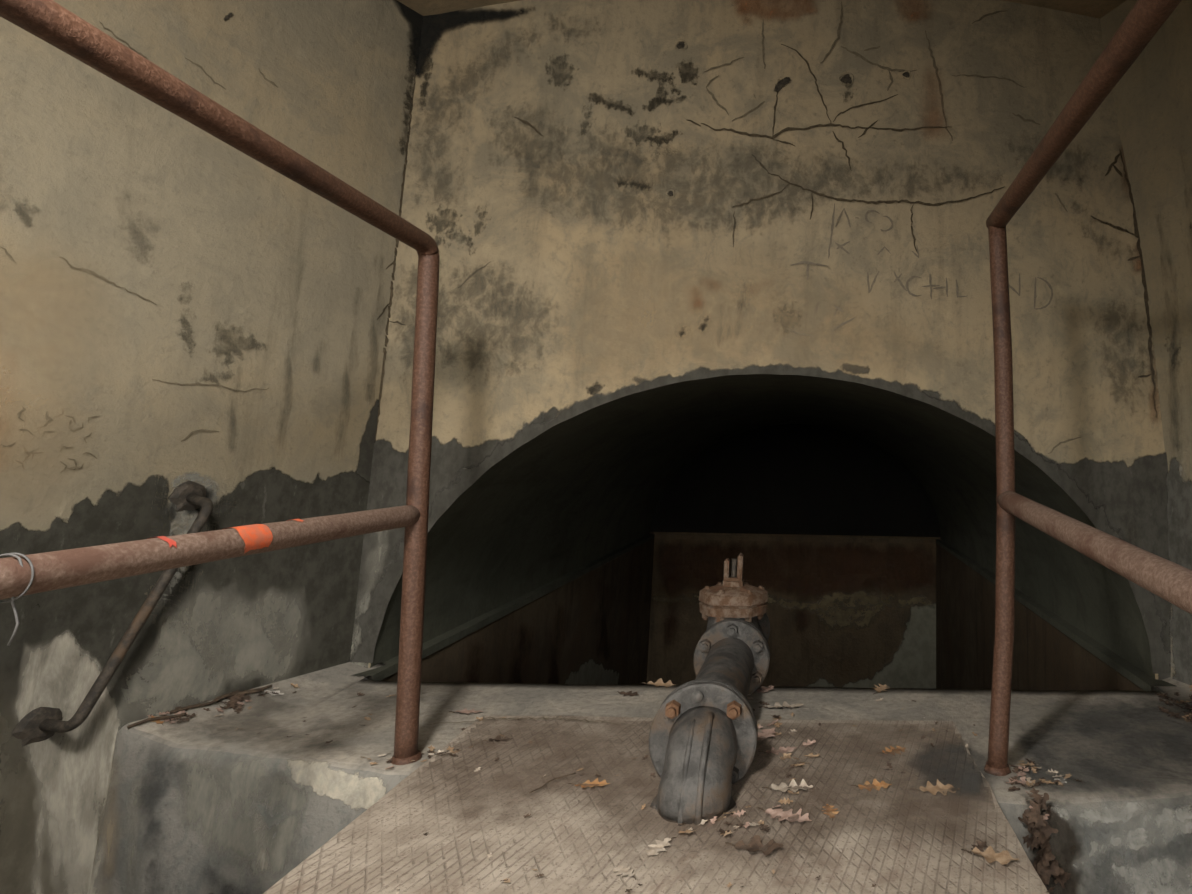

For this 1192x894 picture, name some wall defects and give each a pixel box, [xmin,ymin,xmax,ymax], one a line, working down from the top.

damp [394,0,526,154]
damp [589,62,698,146]
crack [687,1,1040,252]
damp [428,209,486,254]
damp [180,317,195,349]
damp [204,327,265,382]
peeling [428,363,996,532]
peeling [115,567,301,721]
peeling [349,539,404,663]
peeling [565,658,619,685]
rust [657,542,934,643]
peeling [807,603,936,689]